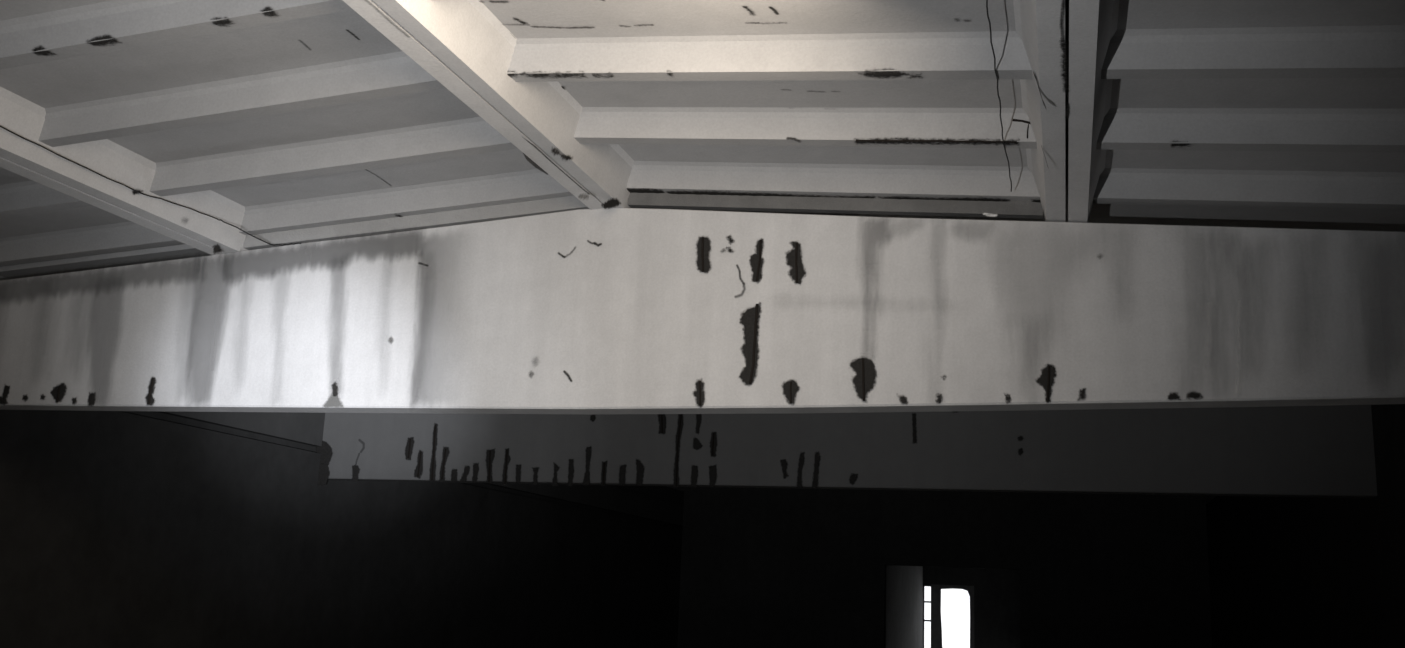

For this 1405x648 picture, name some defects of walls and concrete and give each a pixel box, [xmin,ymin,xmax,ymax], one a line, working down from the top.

spalling [863,69,921,78]
crack [1033,0,1070,118]
spalling [855,119,1031,145]
damp [224,234,418,279]
spalling [696,236,733,273]
spalling [749,239,764,282]
spalling [786,241,806,284]
spalling [739,303,761,385]
spalling [850,358,876,401]
spalling [1036,364,1056,402]
spalling [405,424,644,487]
spalling [658,380,717,488]